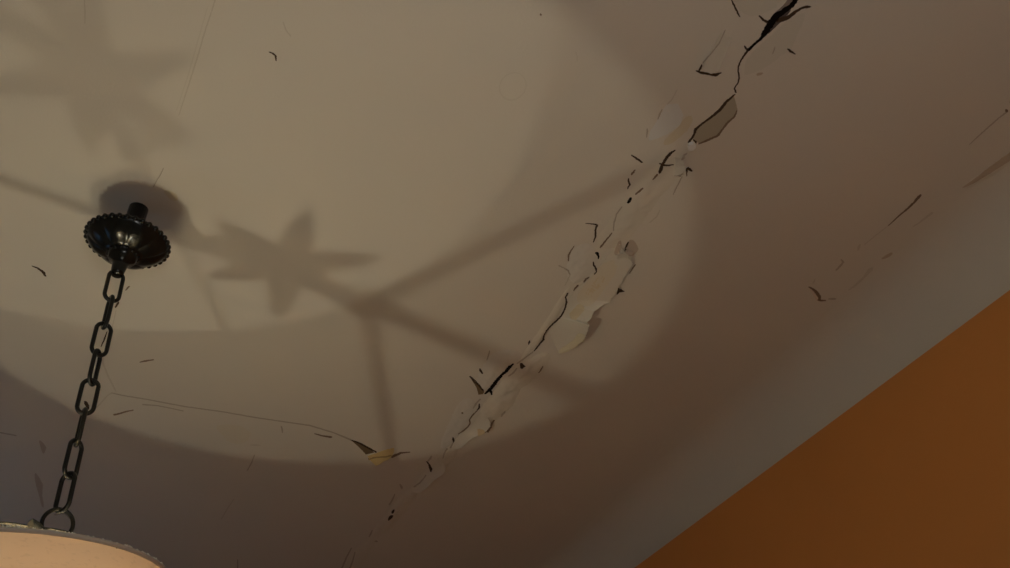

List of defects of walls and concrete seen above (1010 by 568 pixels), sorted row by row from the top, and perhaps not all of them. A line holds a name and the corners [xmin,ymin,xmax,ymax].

crack [101,0,811,505]
peeling [549,288,625,354]